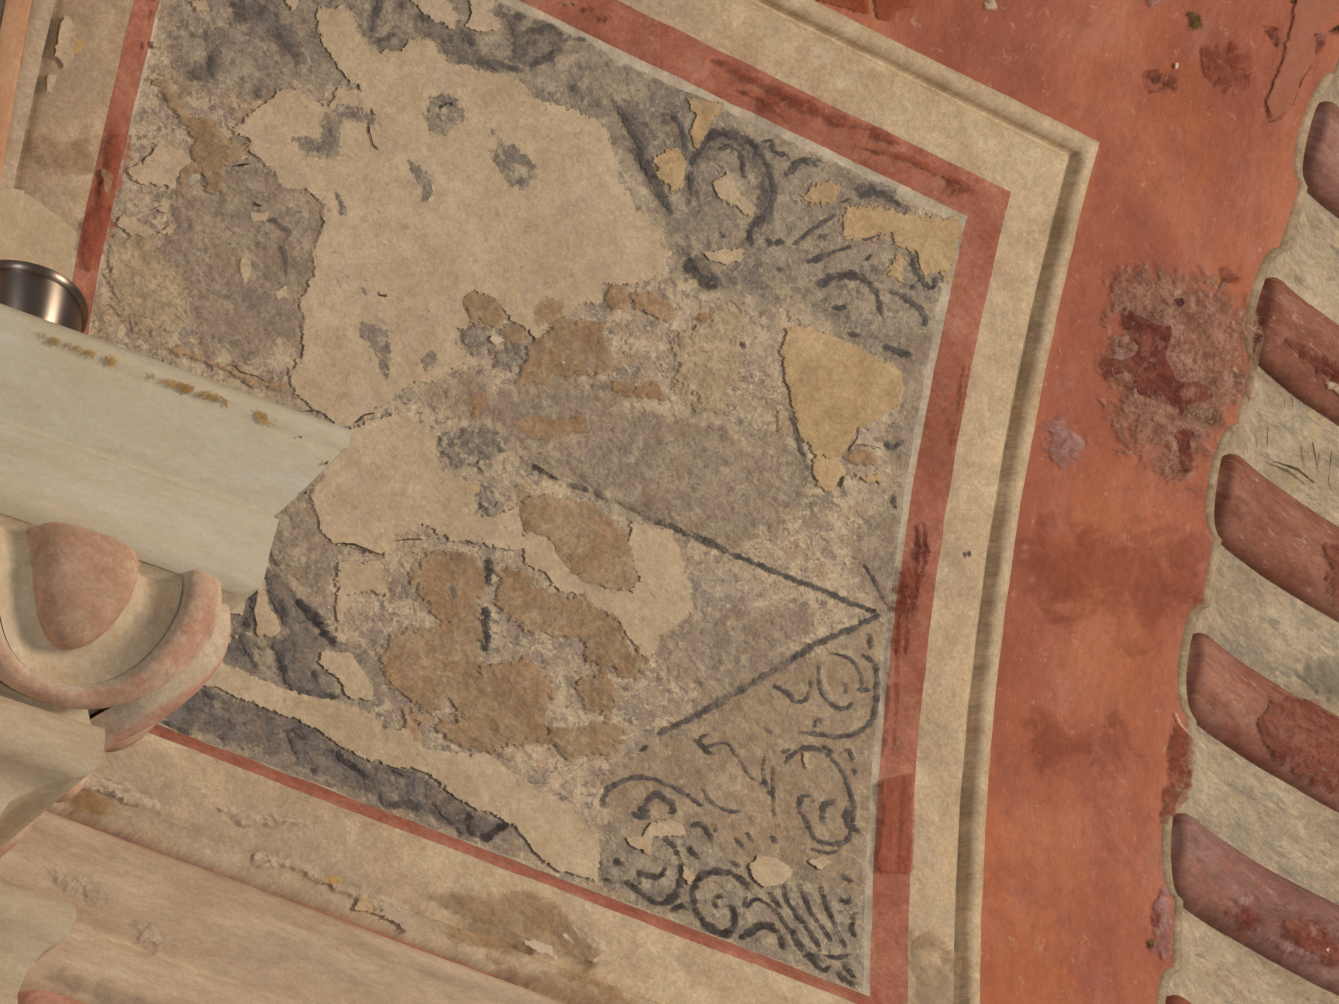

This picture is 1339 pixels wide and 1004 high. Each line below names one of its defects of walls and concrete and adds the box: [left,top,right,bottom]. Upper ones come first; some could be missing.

peeling [46,15,86,93]
peeling [1189,11,1203,30]
peeling [795,178,963,283]
spalling [42,334,118,367]
peeling [82,0,903,885]
peeling [254,852,411,933]
peeling [433,891,609,970]
peeling [749,854,795,889]